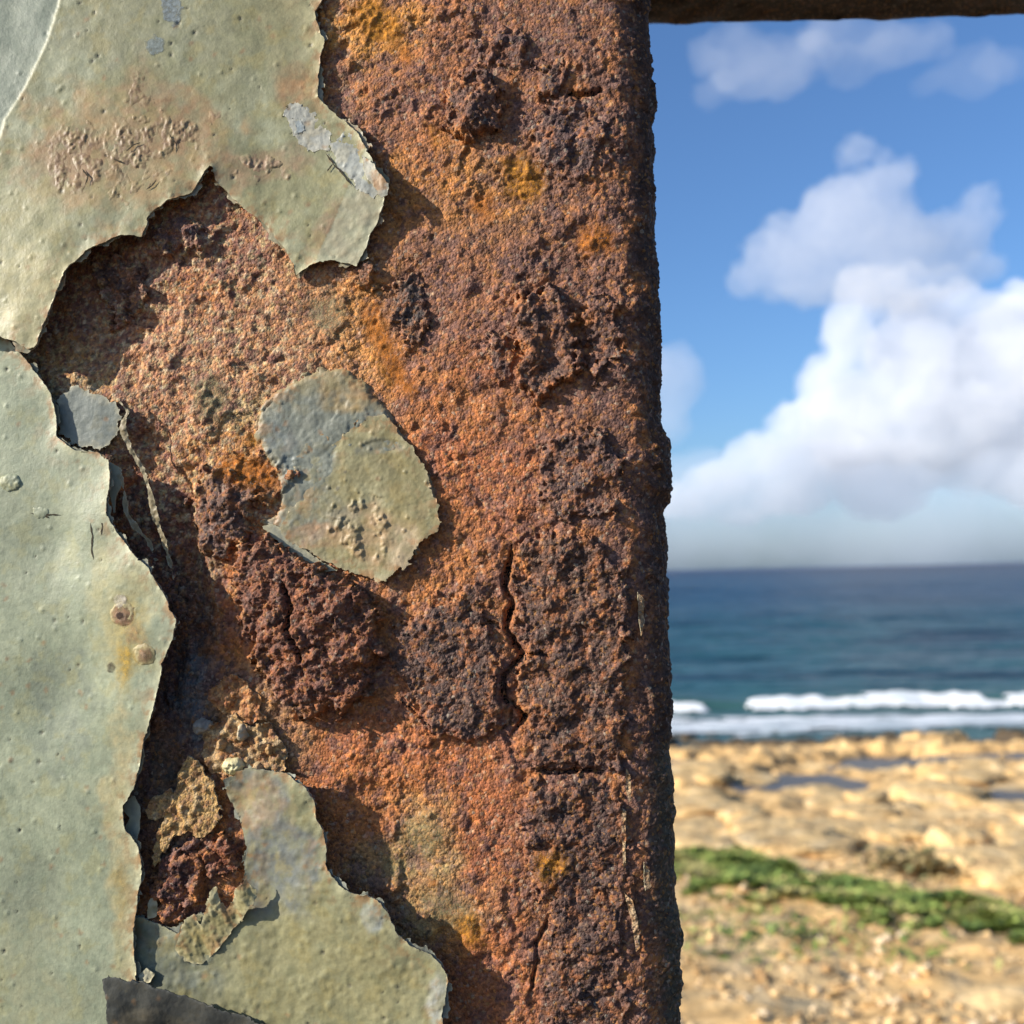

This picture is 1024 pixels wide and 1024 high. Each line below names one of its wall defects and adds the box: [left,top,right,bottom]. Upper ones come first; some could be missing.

corrosion [354,2,399,40]
corrosion [469,24,607,199]
corrosion [350,260,431,392]
corrosion [484,282,630,407]
peeling [0,0,453,1024]
crack [481,538,549,730]
corrosion [182,425,640,1024]